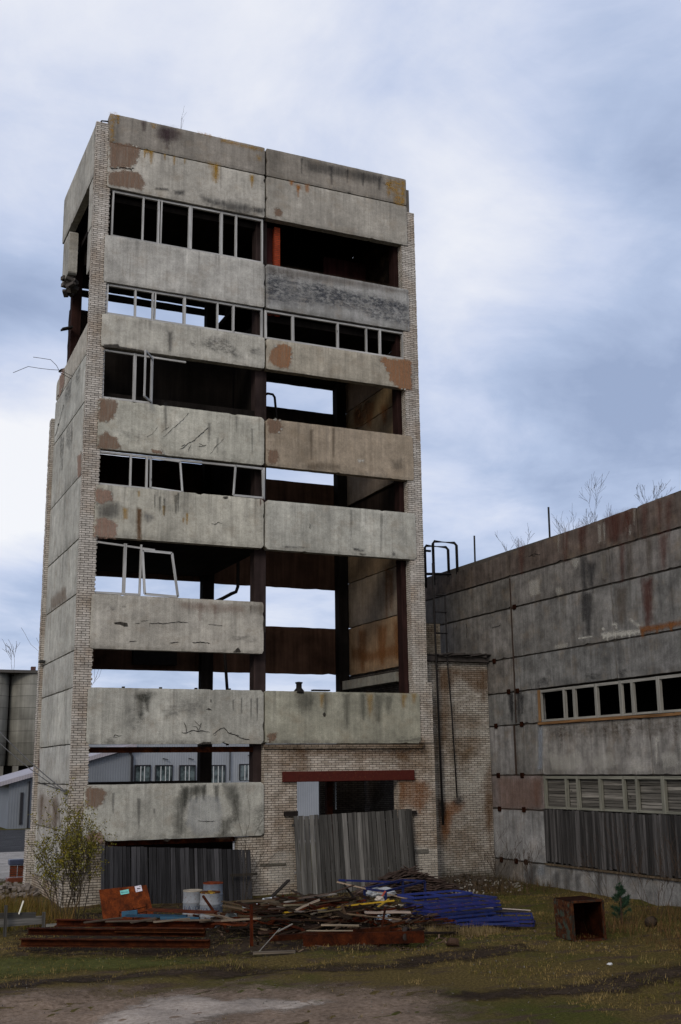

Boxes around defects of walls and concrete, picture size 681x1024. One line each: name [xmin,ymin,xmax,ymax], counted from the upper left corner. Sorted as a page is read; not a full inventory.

peeling [108,142,145,189]
peeling [269,344,293,368]
peeling [379,357,413,390]
peeling [98,398,121,450]
crack [147,414,221,454]
peeling [94,486,113,504]
peeling [94,517,118,539]
crack [182,700,250,740]
peeling [85,787,106,809]